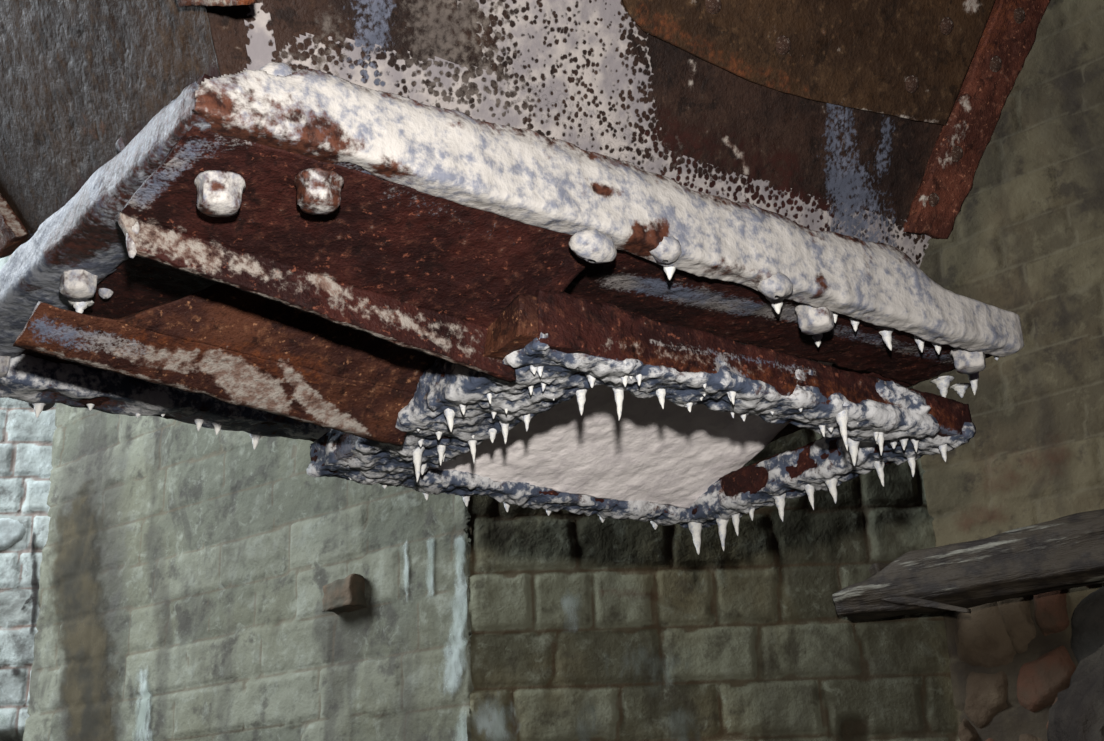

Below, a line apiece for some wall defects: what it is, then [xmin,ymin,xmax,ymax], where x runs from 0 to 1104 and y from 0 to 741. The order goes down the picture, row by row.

leakage [0,0,1024,439]
rust [645,126,834,232]
crack [22,532,38,633]
leakage [444,537,467,692]